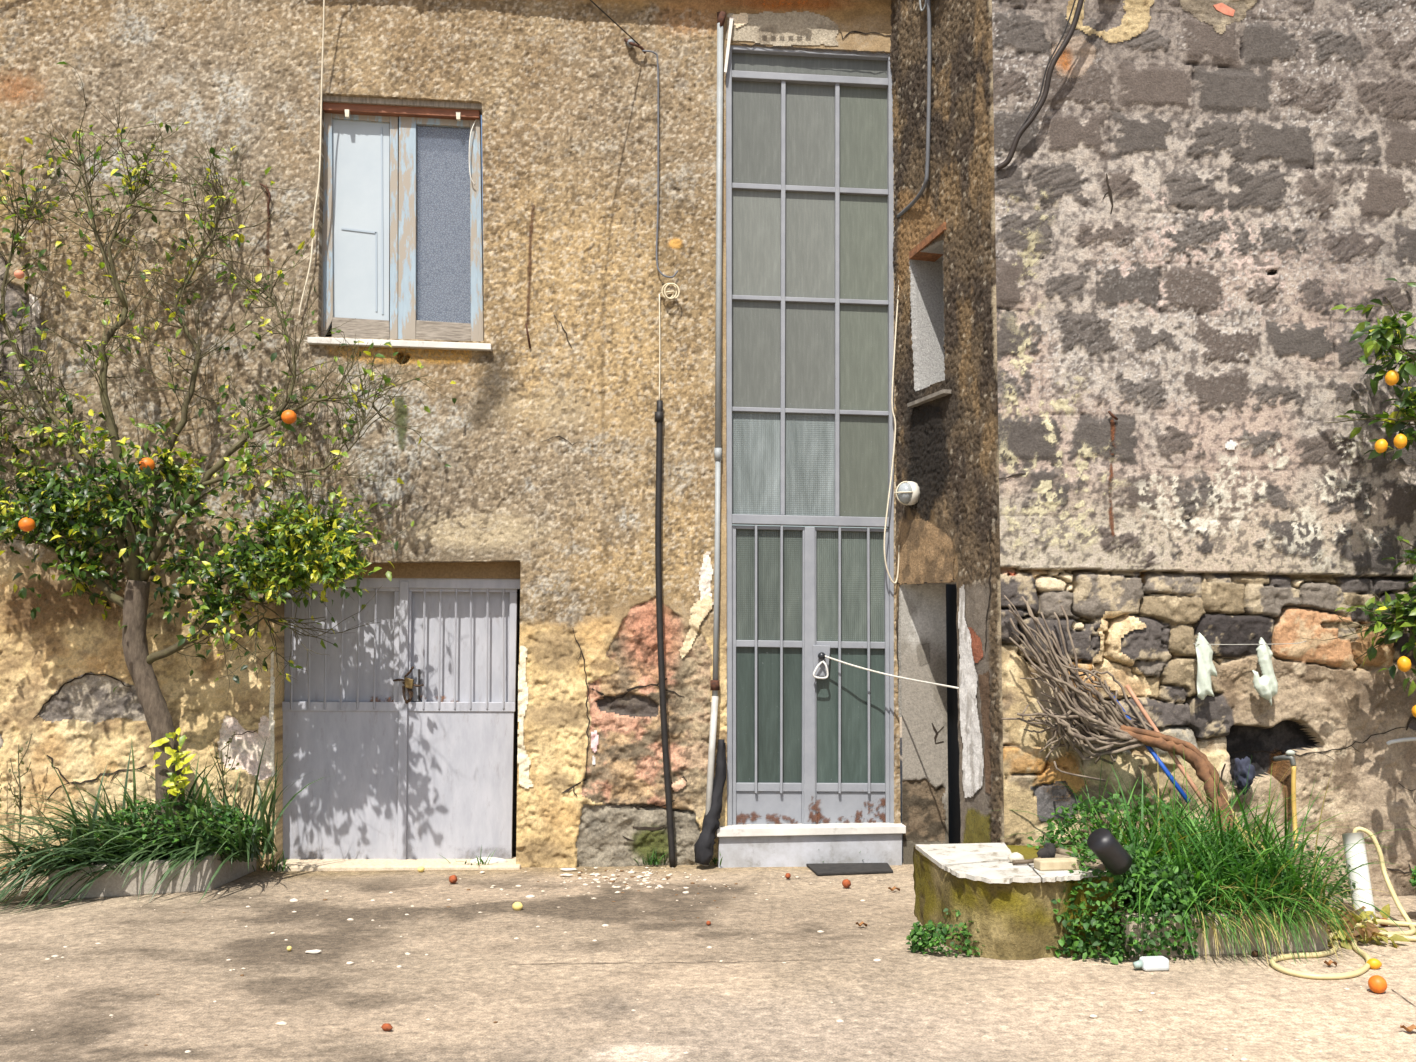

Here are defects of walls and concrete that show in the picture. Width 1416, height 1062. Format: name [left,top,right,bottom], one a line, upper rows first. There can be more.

peeling [731,13,748,28]
spalling [1213,3,1235,16]
peeling [898,519,992,798]
flaking render [39,672,146,724]
flaking render [576,552,715,867]
spalling [1225,719,1321,790]
crack [1220,716,1416,782]
corrosion [736,798,886,825]
flaking render [902,779,946,843]